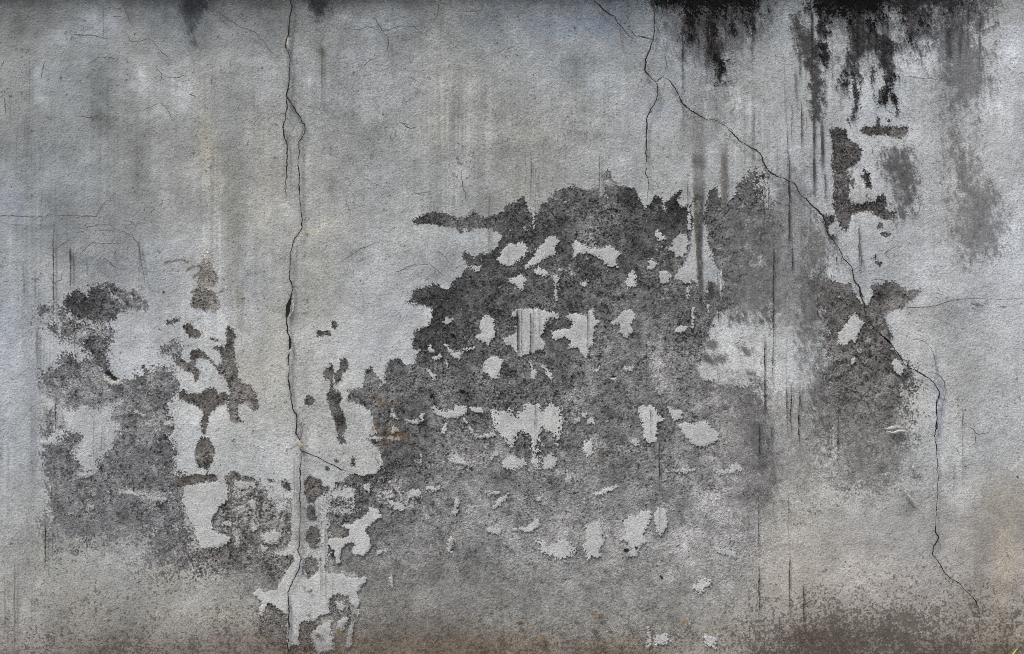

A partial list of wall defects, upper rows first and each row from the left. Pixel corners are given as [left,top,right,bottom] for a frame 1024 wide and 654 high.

crack [348,0,498,68]
crack [206,0,357,654]
peeling [33,166,792,654]
crack [594,0,991,638]
water stain [786,381,801,441]
water stain [648,0,1012,407]
peeling [823,87,908,240]
peeling [800,267,934,508]
crack [908,298,1021,308]